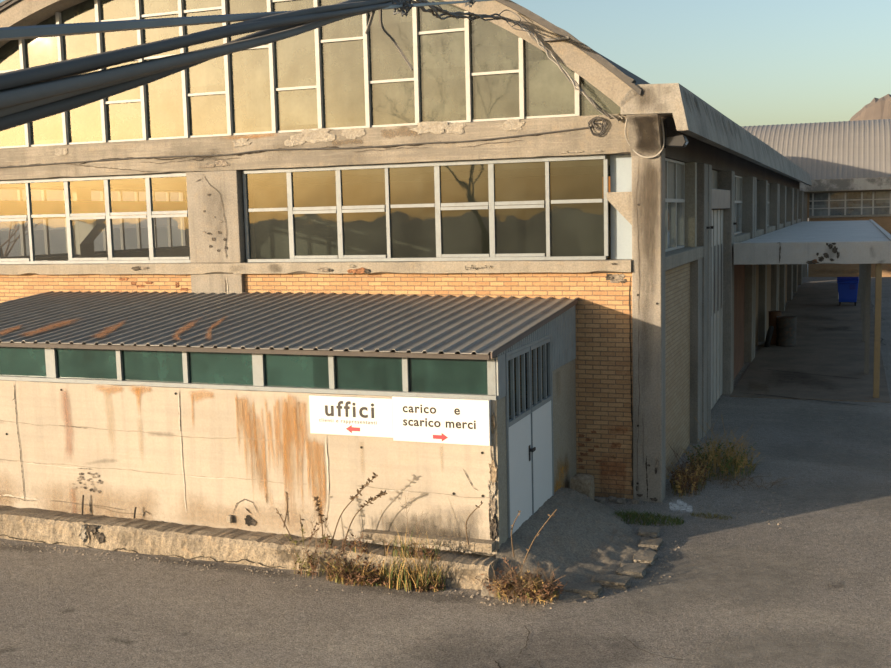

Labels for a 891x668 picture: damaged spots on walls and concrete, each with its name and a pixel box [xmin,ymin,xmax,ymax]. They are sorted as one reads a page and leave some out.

peeling [284,128,365,147]
peeling [381,121,466,138]
peeling [806,243,840,264]
corrosion [236,397,325,491]